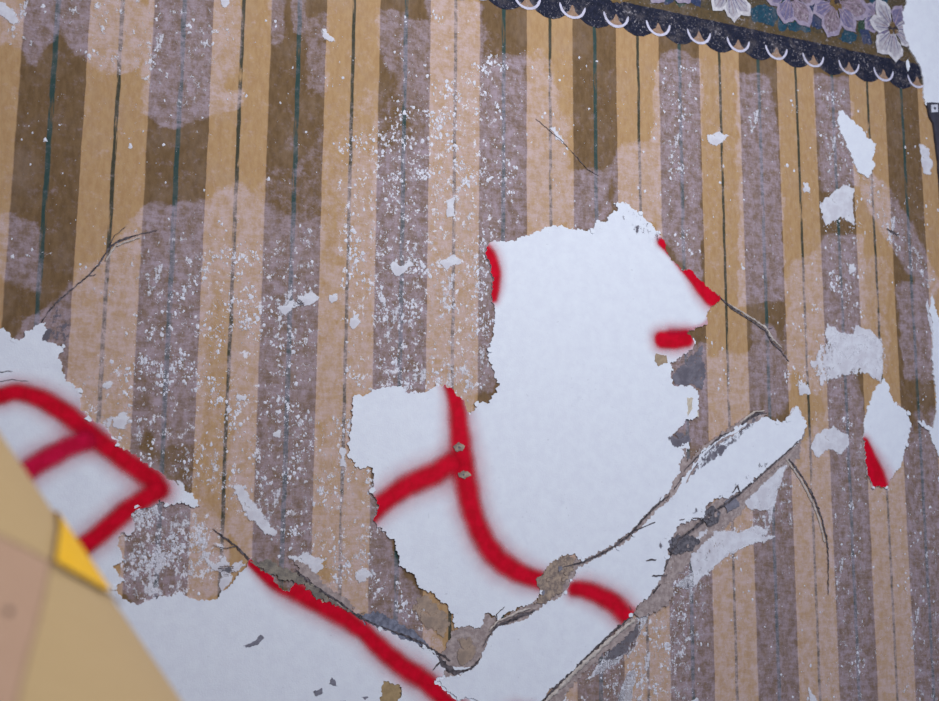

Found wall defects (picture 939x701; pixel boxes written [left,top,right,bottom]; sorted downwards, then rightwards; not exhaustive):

peeling [902,0,939,106]
peeling [837,110,876,178]
crack [41,226,157,323]
crack [716,293,789,361]
peeling [0,401,74,463]
peeling [0,323,120,447]
peeling [32,202,807,701]
crack [564,410,767,567]
peeling [862,293,939,489]
crack [213,529,258,563]
crack [295,569,536,675]
crack [542,440,829,701]